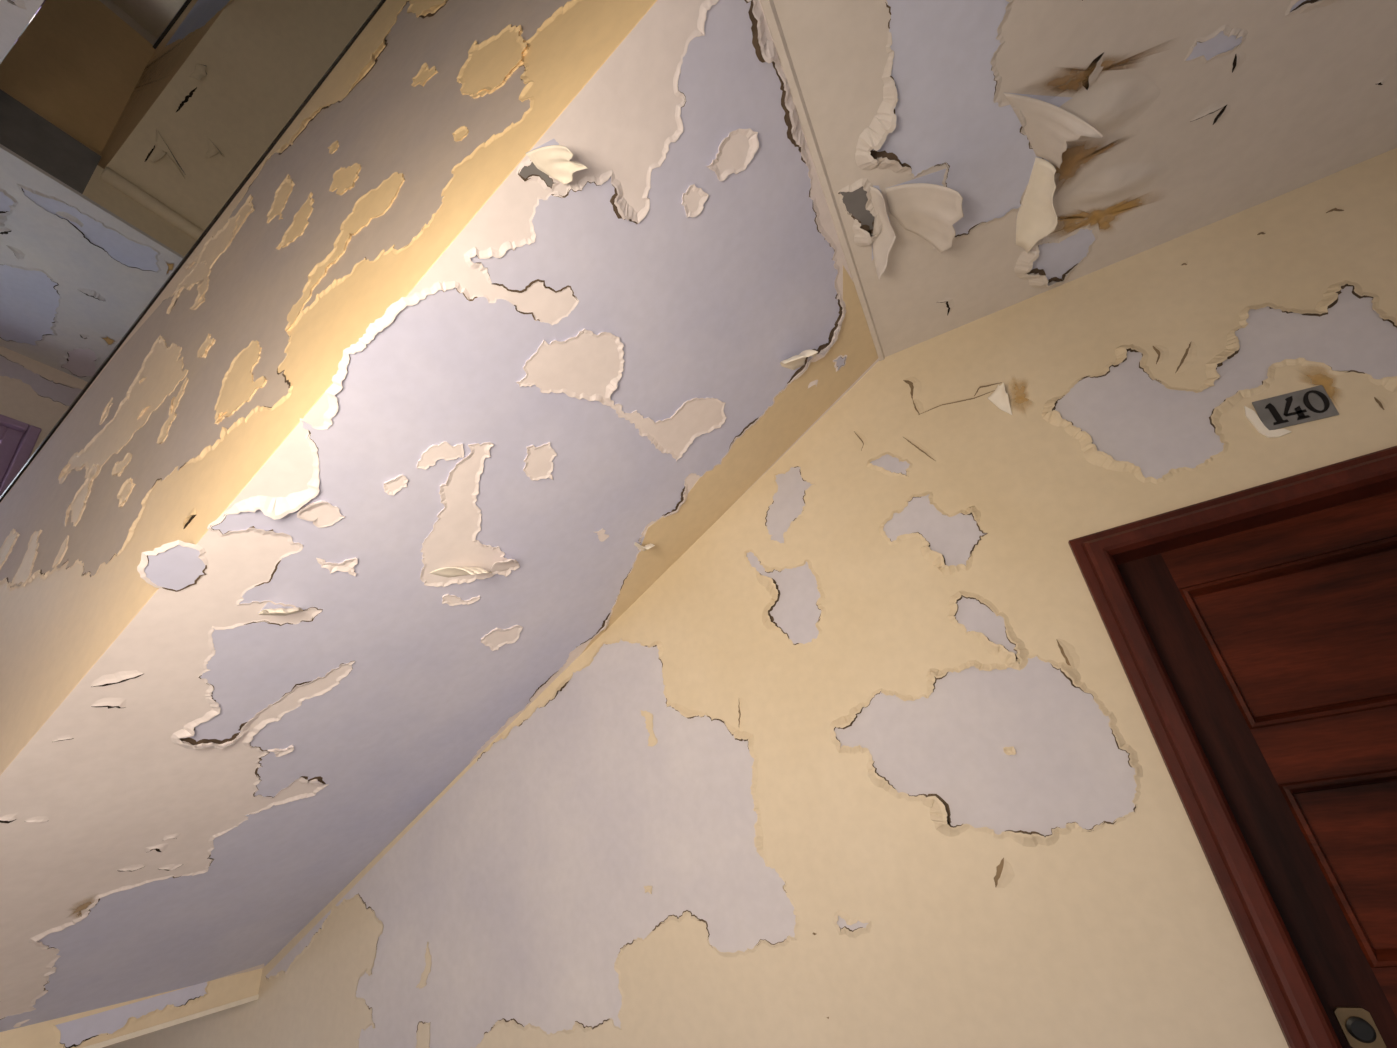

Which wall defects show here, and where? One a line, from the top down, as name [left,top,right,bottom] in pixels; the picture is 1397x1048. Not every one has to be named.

peeling [1284,0,1338,17]
peeling [837,0,1103,289]
peeling [988,383,1012,415]
peeling [1042,280,1397,484]
peeling [0,0,847,1048]
peeling [866,452,988,575]
peeling [829,591,1143,847]
peeling [833,910,872,938]
peeling [994,858,1015,889]